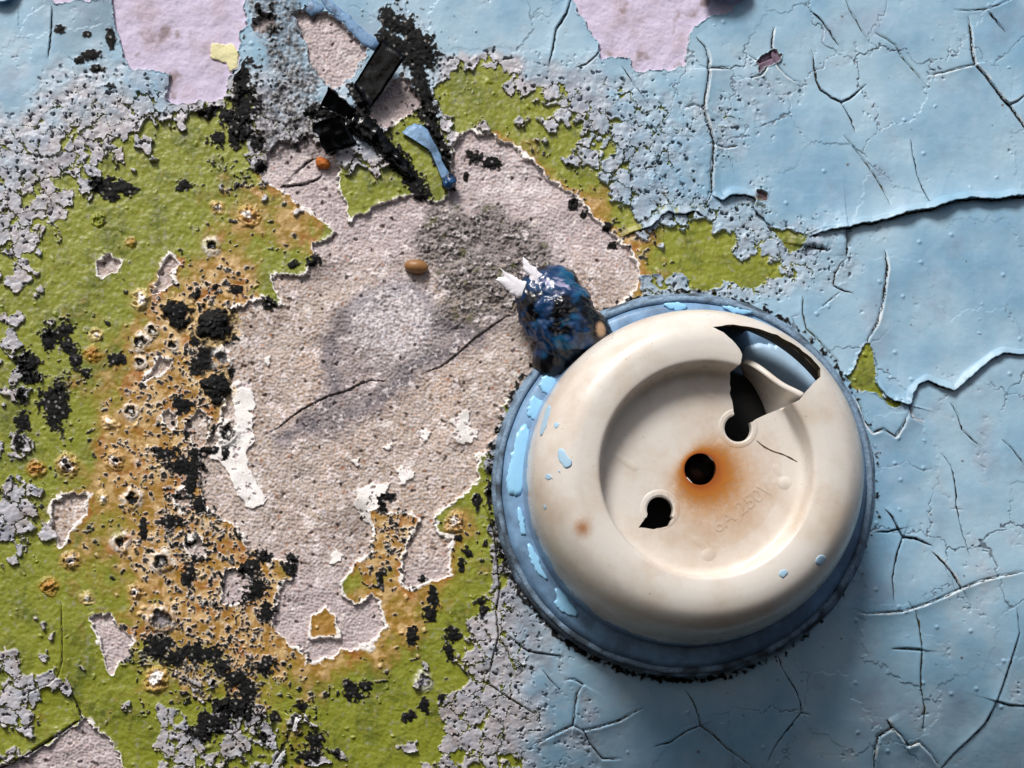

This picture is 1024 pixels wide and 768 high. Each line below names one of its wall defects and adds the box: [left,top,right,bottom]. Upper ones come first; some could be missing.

crack [549,0,571,64]
crack [618,1,1024,361]
damp [13,321,93,451]
damp [107,350,126,370]
crack [268,375,390,434]
peeling [0,0,816,768]
crack [424,315,516,373]
peeling [847,343,902,408]
crack [854,347,1024,448]
damp [122,276,340,768]
crack [482,503,643,760]
crack [851,509,1024,768]